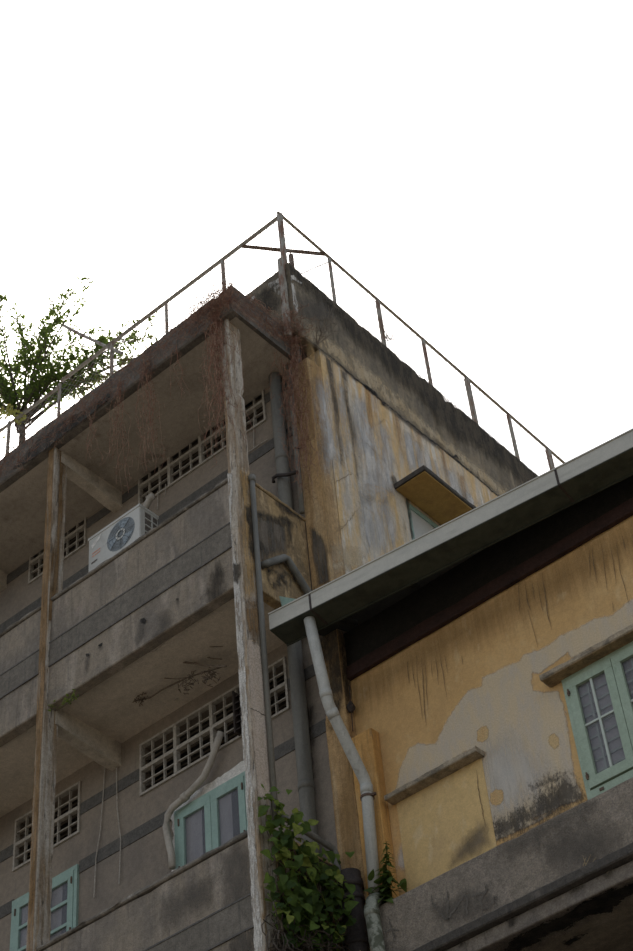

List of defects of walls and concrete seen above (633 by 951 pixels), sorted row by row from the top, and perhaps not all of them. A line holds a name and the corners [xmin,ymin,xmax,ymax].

water stain [289,263,538,495]
water stain [207,471,301,639]
water stain [312,528,362,584]
peeling [396,599,633,841]
water stain [493,772,585,851]